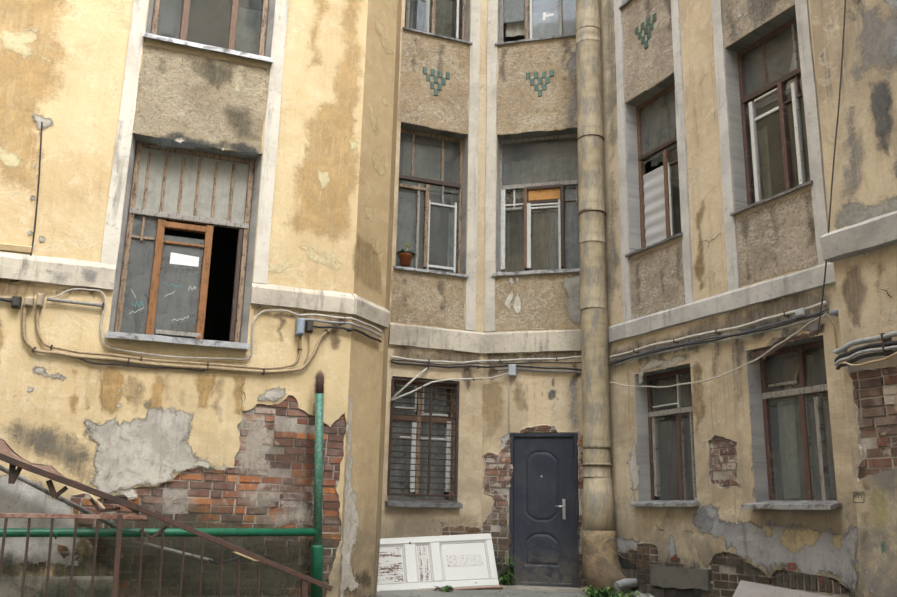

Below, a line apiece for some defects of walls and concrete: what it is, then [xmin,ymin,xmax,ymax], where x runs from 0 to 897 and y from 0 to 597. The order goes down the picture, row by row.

damp [0,0,64,161]
damp [294,0,359,237]
damp [835,106,897,229]
damp [851,0,897,151]
flaking render [32,366,67,381]
flaking render [0,388,360,597]
flaking render [434,424,559,585]
flaking render [616,536,640,554]
flaking render [695,435,860,597]
flaking render [843,350,897,482]